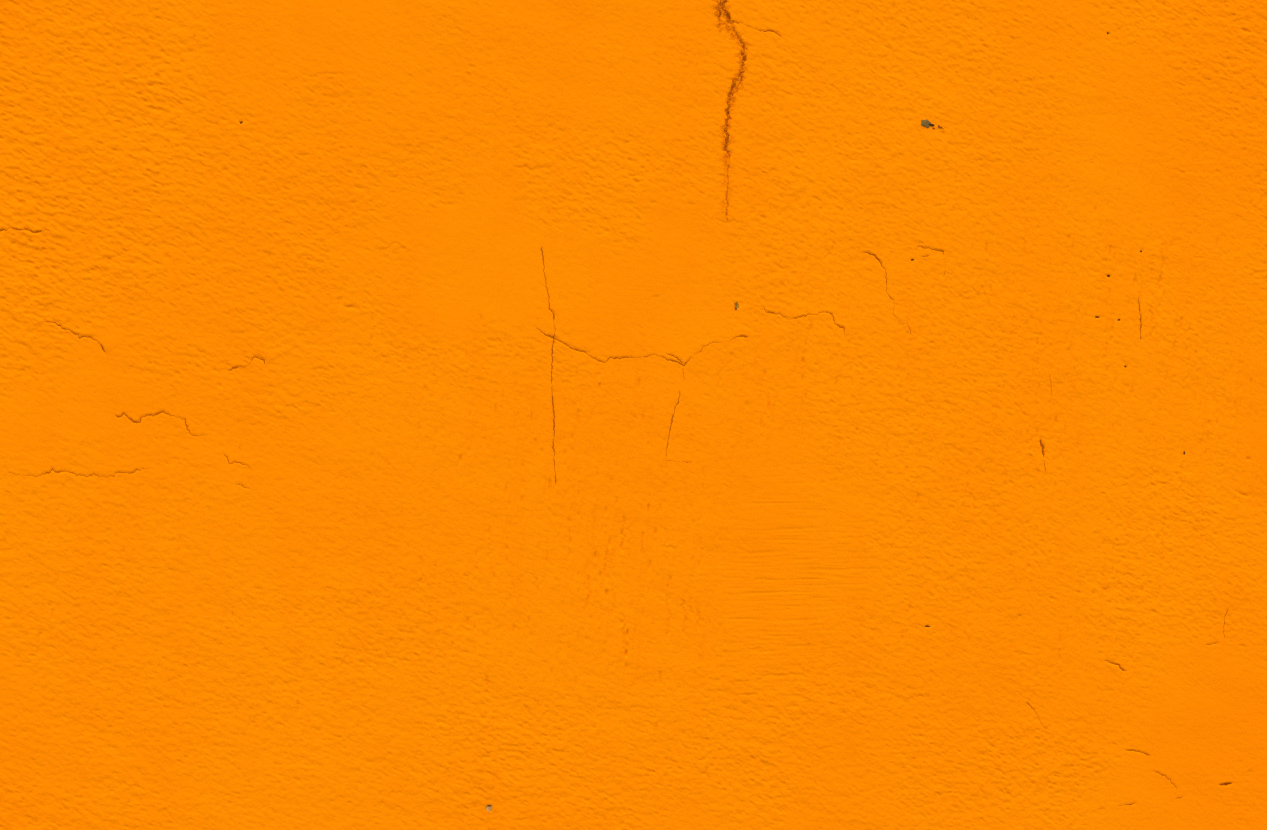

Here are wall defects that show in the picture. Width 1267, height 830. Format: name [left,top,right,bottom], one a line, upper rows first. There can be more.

crack [720,0,780,150]
crack [544,304,626,481]